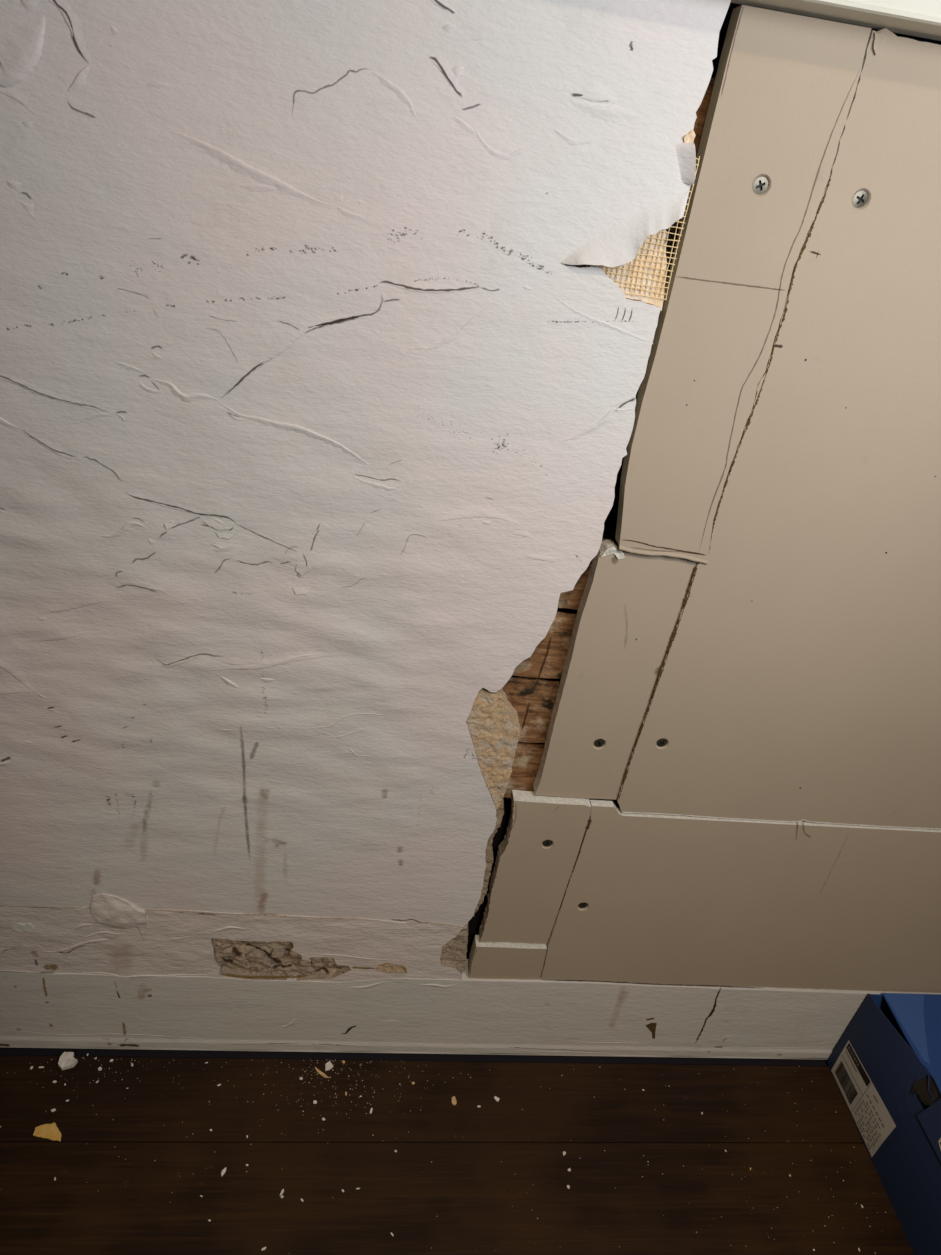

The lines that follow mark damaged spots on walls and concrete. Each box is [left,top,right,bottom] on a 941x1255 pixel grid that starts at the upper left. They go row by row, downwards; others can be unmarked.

crack [20,0,91,93]
crack [431,0,458,16]
crack [430,57,465,99]
spalling [711,3,740,78]
spalling [871,29,941,45]
peeling [560,129,700,321]
crack [115,281,479,467]
crack [125,493,232,520]
spalling [600,457,625,559]
spalling [441,676,561,972]
spalling [212,938,407,979]
crack [696,989,721,1042]